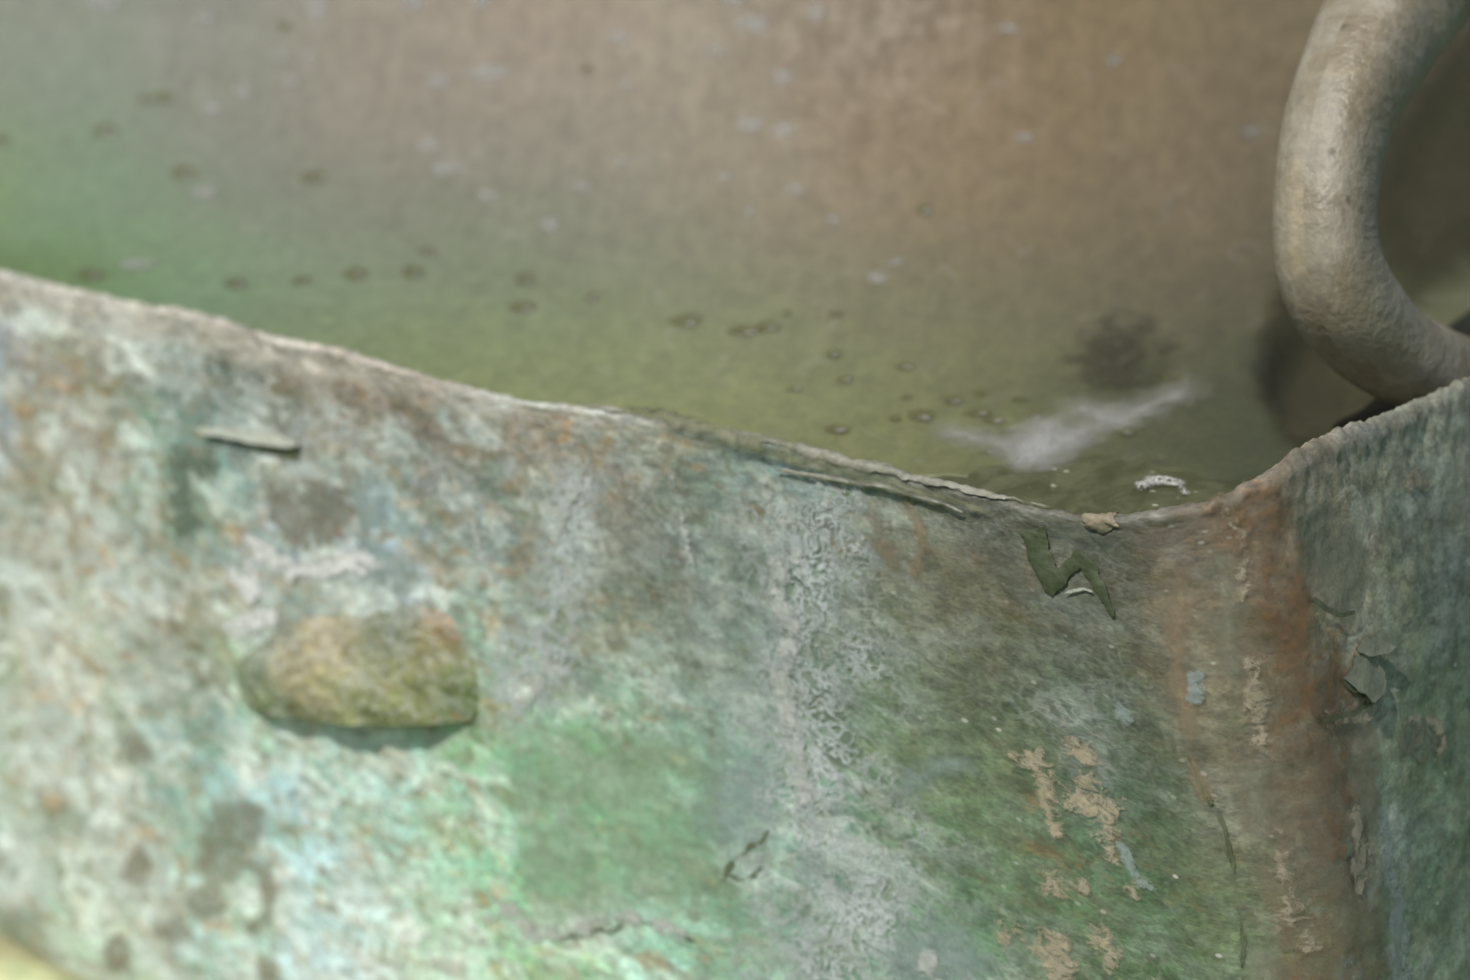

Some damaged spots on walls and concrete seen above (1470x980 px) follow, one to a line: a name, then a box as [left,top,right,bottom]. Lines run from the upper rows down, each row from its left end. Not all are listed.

peeling [1116,702,1133,724]
rust [1216,481,1351,953]
peeling [1321,636,1396,725]
peeling [1007,720,1153,900]
rust [1328,781,1372,903]
peeling [996,920,1079,980]
peeling [1089,923,1122,980]